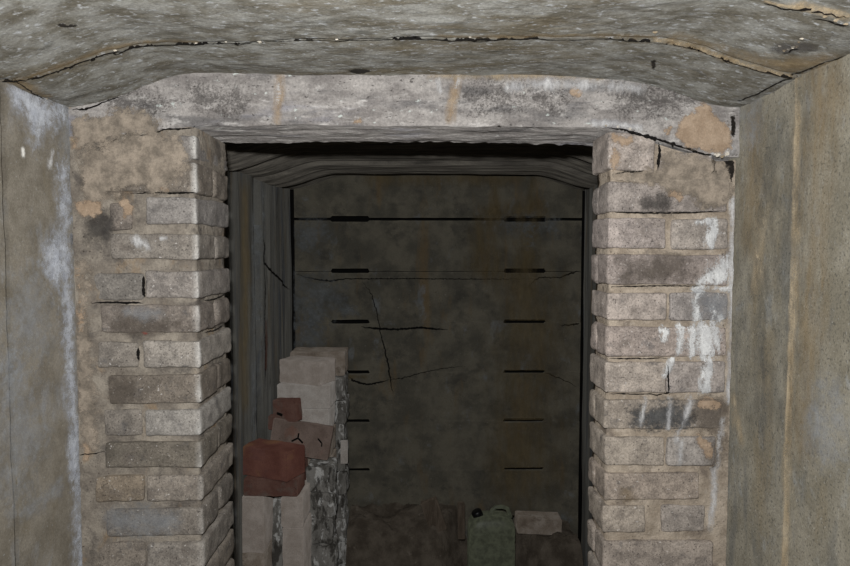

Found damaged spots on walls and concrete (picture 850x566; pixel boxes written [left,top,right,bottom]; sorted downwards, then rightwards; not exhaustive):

crack [2,39,348,110]
crack [375,34,550,42]
crack [608,31,843,101]
crack [607,127,720,174]
peeling [592,102,736,210]
crack [92,276,145,304]
crack [263,238,579,391]
water stain [43,156,82,566]
crack [610,358,670,395]
water stain [658,198,735,521]